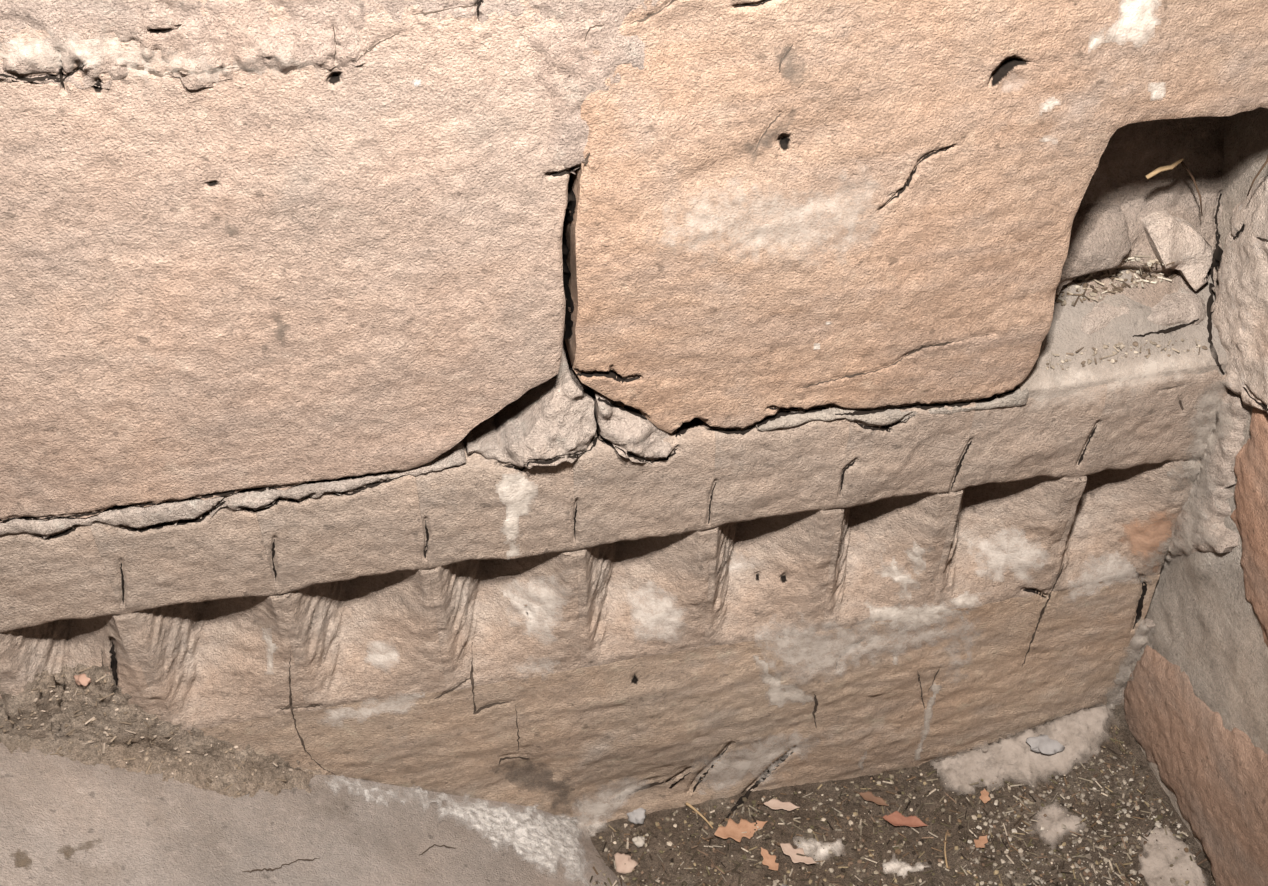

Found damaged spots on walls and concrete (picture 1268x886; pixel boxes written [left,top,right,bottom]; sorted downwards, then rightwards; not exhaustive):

crack [584,0,676,41]
crack [735,0,771,8]
leakage [1089,0,1159,48]
crack [499,146,1017,471]
crack [0,470,404,540]
leakage [496,474,538,557]
crack [1022,563,1064,666]